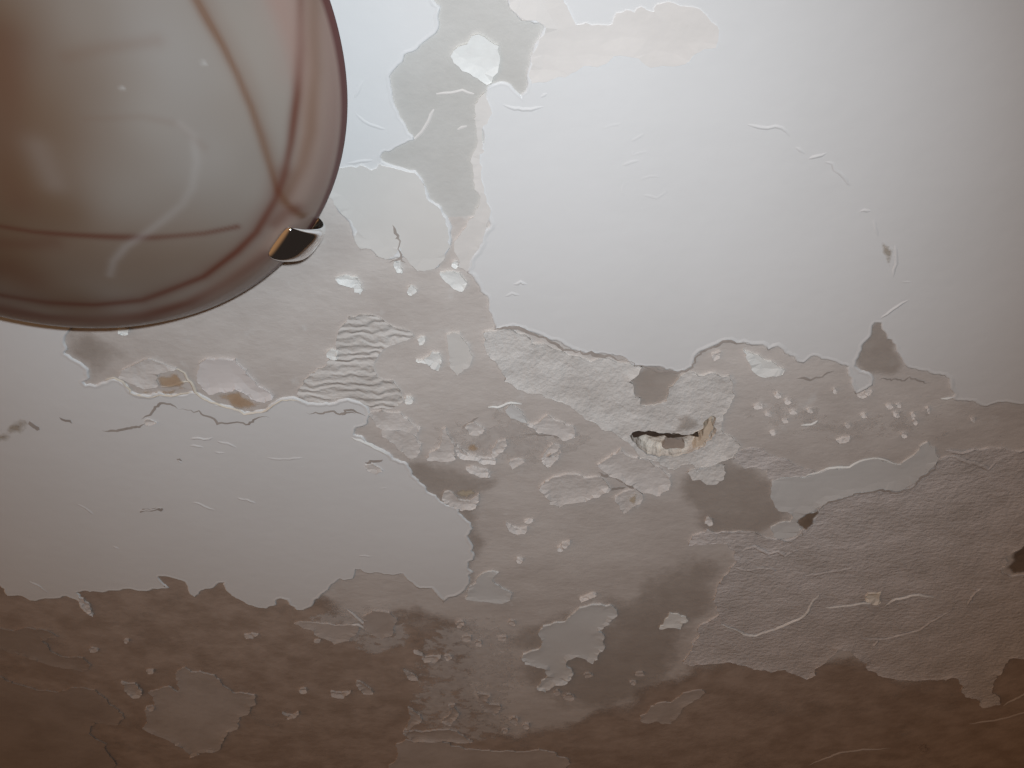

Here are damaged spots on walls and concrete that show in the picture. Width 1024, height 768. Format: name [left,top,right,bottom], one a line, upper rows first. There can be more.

peeling [376,0,546,219]
crack [105,402,269,432]
peeling [0,198,1024,744]
leakage [1009,547,1024,573]
leakage [0,576,1024,768]